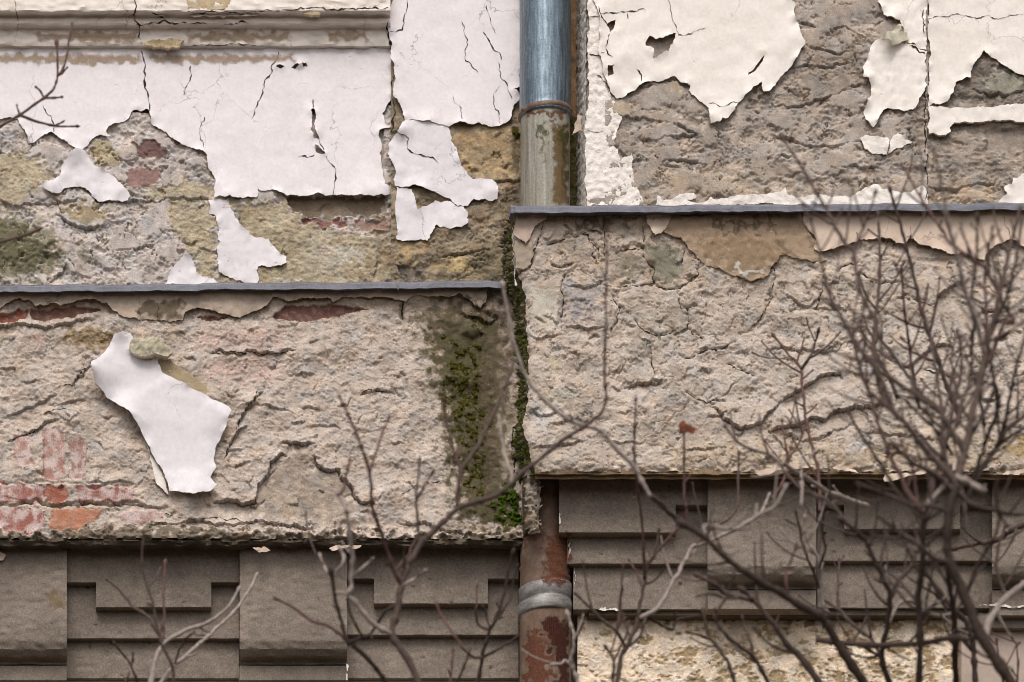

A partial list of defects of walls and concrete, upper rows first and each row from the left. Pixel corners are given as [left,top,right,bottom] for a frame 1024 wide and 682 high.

crack [133,0,408,116]
flaking render [0,60,547,286]
crack [390,76,436,160]
corrosion [521,108,566,127]
flaking render [570,0,1024,282]
flaking render [274,304,369,322]
crack [519,218,776,376]
crack [8,366,90,442]
peeling [91,331,231,494]
water stain [409,295,514,528]
corrosion [542,532,573,586]
corrosion [522,616,569,682]